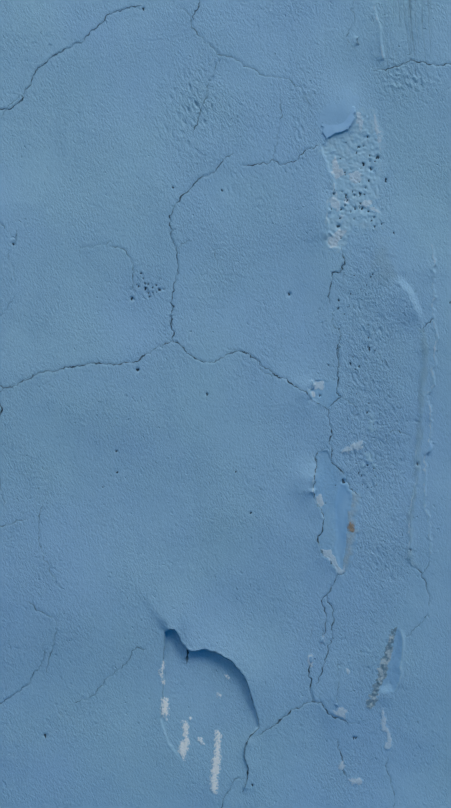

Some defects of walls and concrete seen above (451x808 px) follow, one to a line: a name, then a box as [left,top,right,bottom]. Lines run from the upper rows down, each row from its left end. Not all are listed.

crack [0,5,140,111]
crack [187,0,310,131]
crack [374,59,449,71]
crack [0,104,358,735]
peeling [311,438,372,577]
spalling [364,625,406,751]